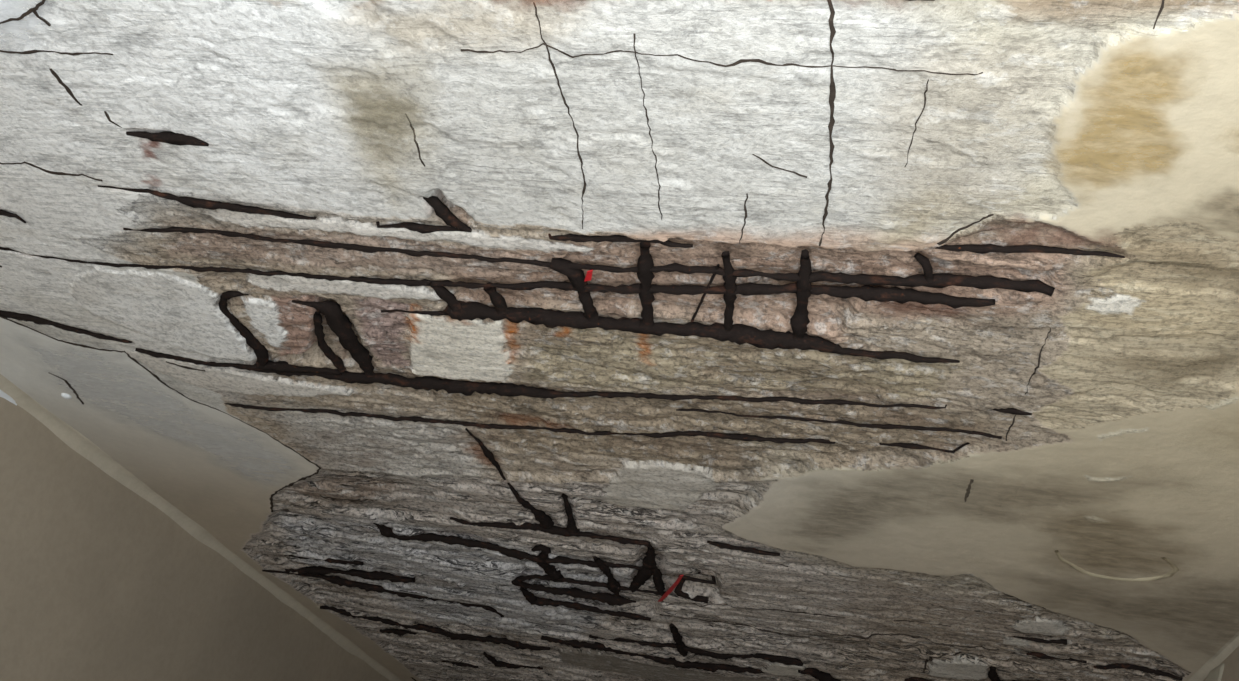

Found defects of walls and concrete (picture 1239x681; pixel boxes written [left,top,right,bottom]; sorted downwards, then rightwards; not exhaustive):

spalling [0,0,1239,409]
crack [461,0,983,246]
water stain [1063,57,1176,182]
spalling [68,215,1239,681]